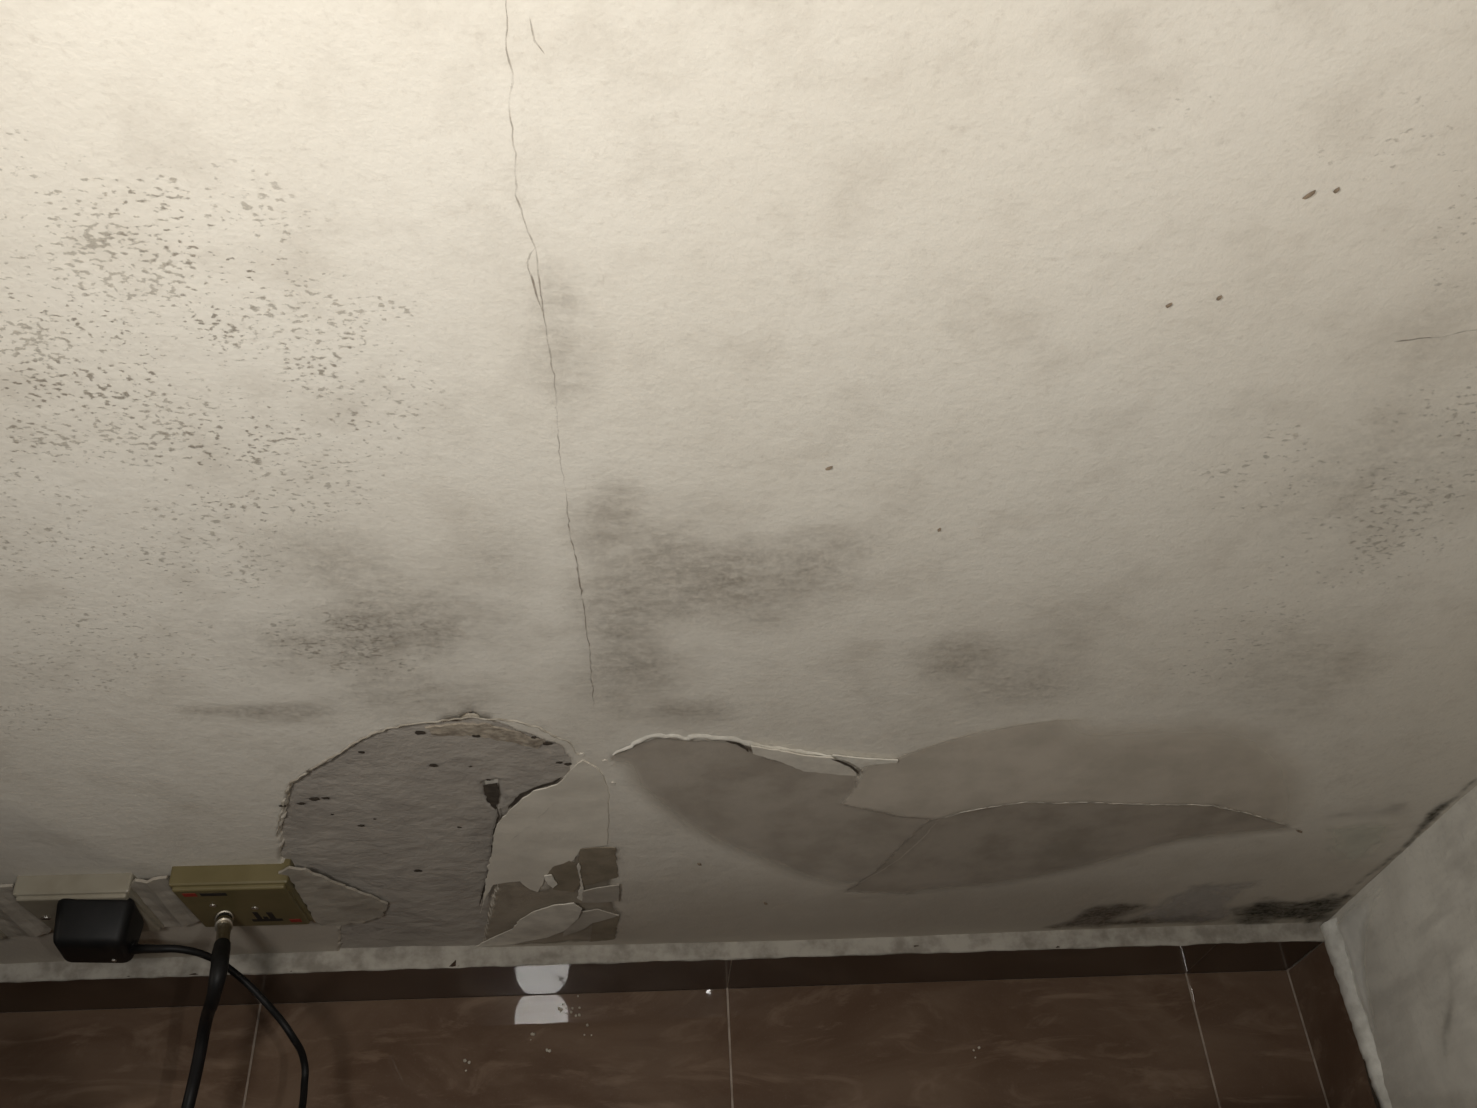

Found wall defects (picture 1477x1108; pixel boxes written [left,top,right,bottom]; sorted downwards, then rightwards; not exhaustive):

peeling [276,713,1302,948]
leakage [1067,887,1344,926]